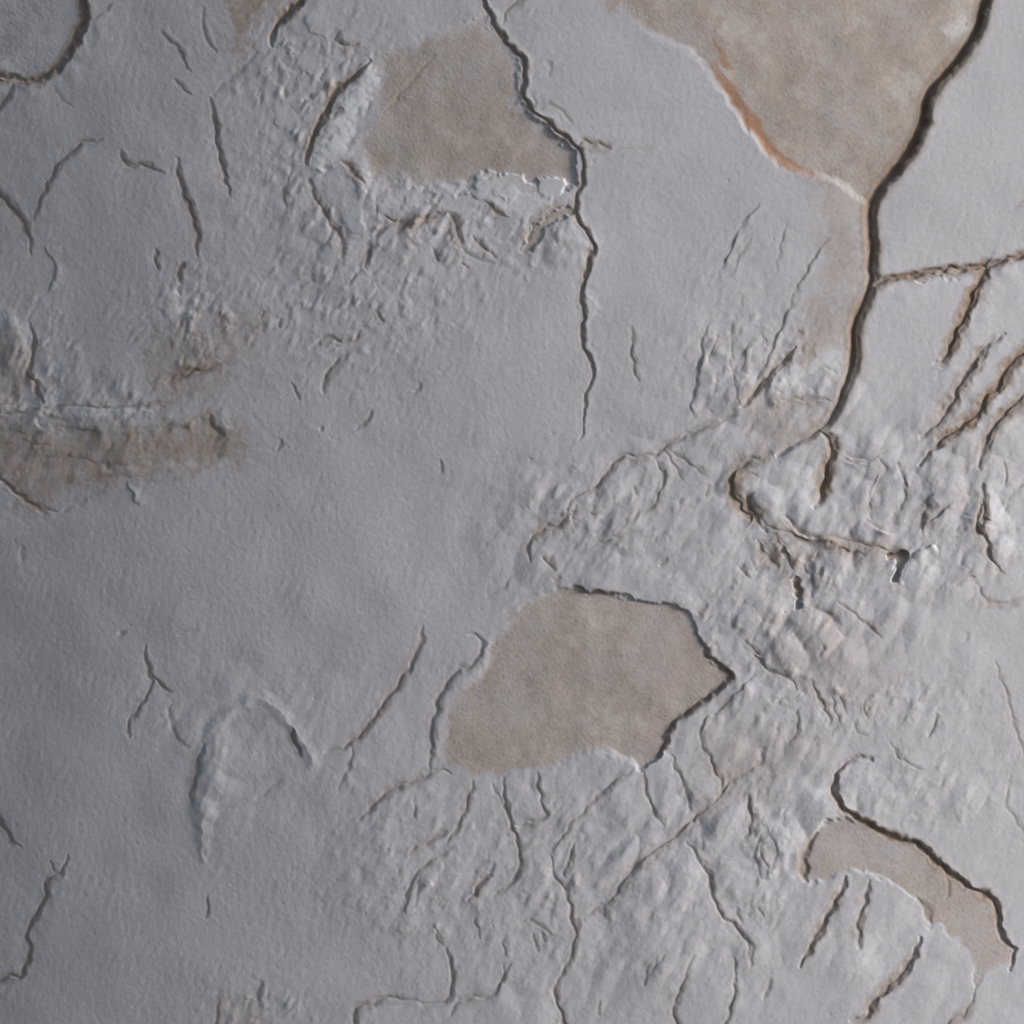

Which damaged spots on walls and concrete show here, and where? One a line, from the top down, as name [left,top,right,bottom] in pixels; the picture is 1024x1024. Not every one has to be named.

crack [0,0,95,113]
spalling [293,6,372,78]
spalling [313,10,580,256]
crack [281,0,612,441]
crack [523,0,1024,610]
spalling [615,0,980,212]
water stain [0,293,285,523]
crack [125,643,173,739]
spalling [436,584,738,782]
crack [0,855,70,985]
spalling [802,815,1013,992]